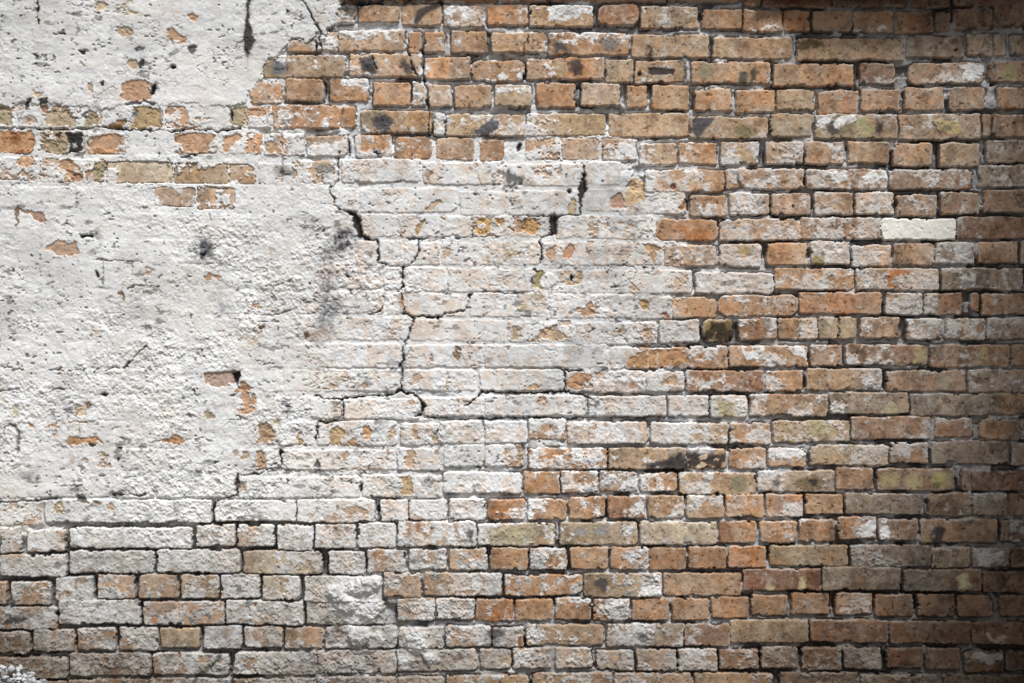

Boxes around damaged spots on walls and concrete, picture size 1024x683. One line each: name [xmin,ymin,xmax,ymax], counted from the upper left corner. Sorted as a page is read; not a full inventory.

spalling [0,0,271,186]
crack [313,133,592,442]
spalling [192,369,282,473]
spalling [236,481,249,493]